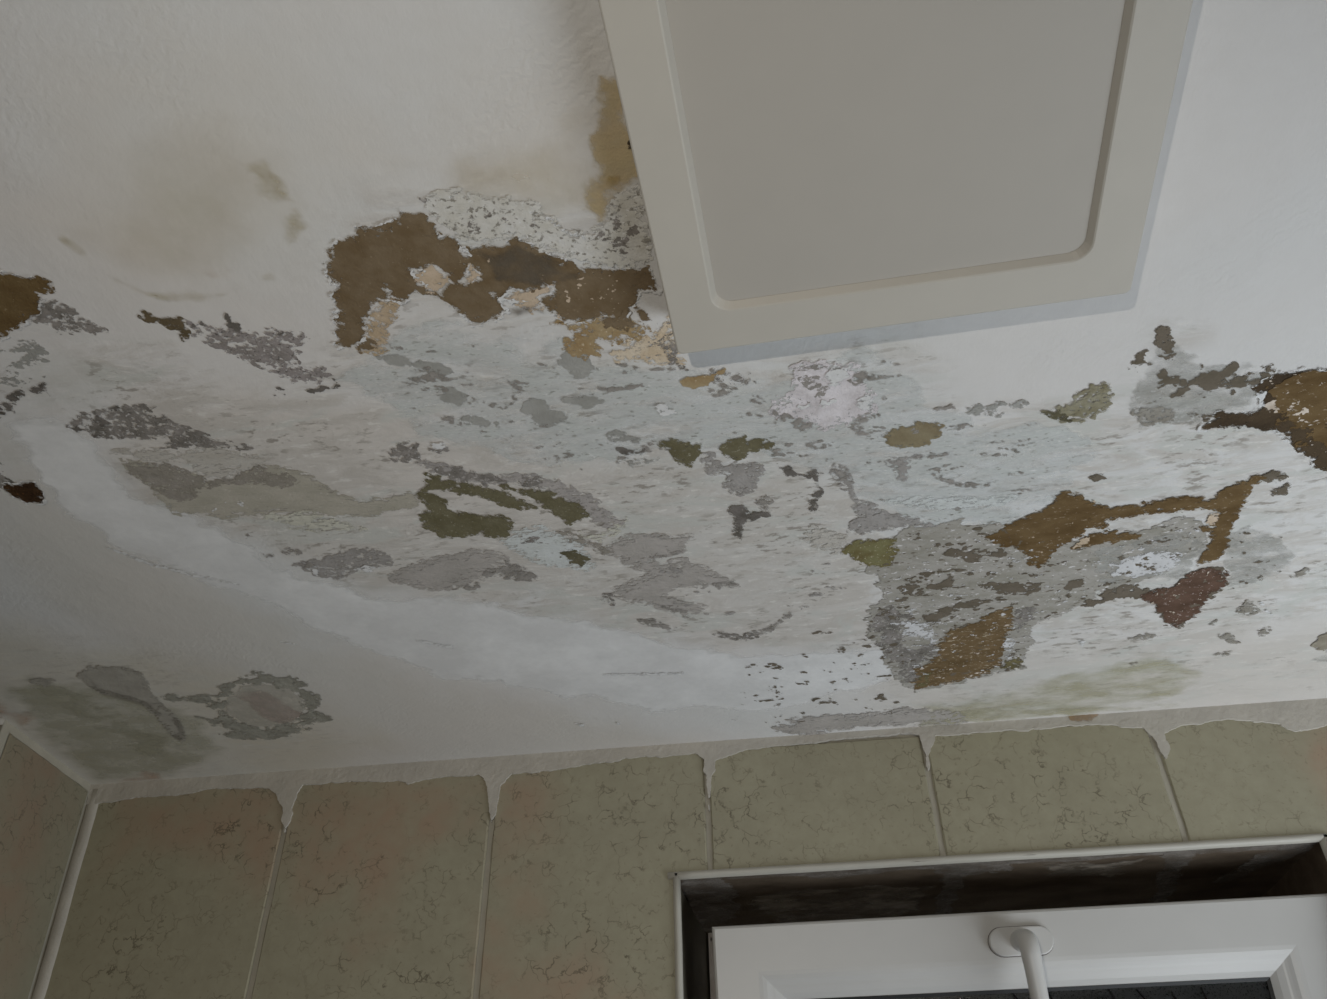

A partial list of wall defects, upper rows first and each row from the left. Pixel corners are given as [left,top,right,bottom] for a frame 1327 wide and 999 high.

leakage [587,77,638,217]
flaking render [0,462,47,506]
peeling [0,270,109,415]
peeling [137,310,340,402]
peeling [263,441,628,592]
peeling [322,184,881,432]
peeling [606,429,775,539]
peeling [883,421,945,448]
peeling [966,382,1115,424]
peeling [842,470,1291,693]
peeling [1128,326,1327,471]
leakage [16,671,334,773]